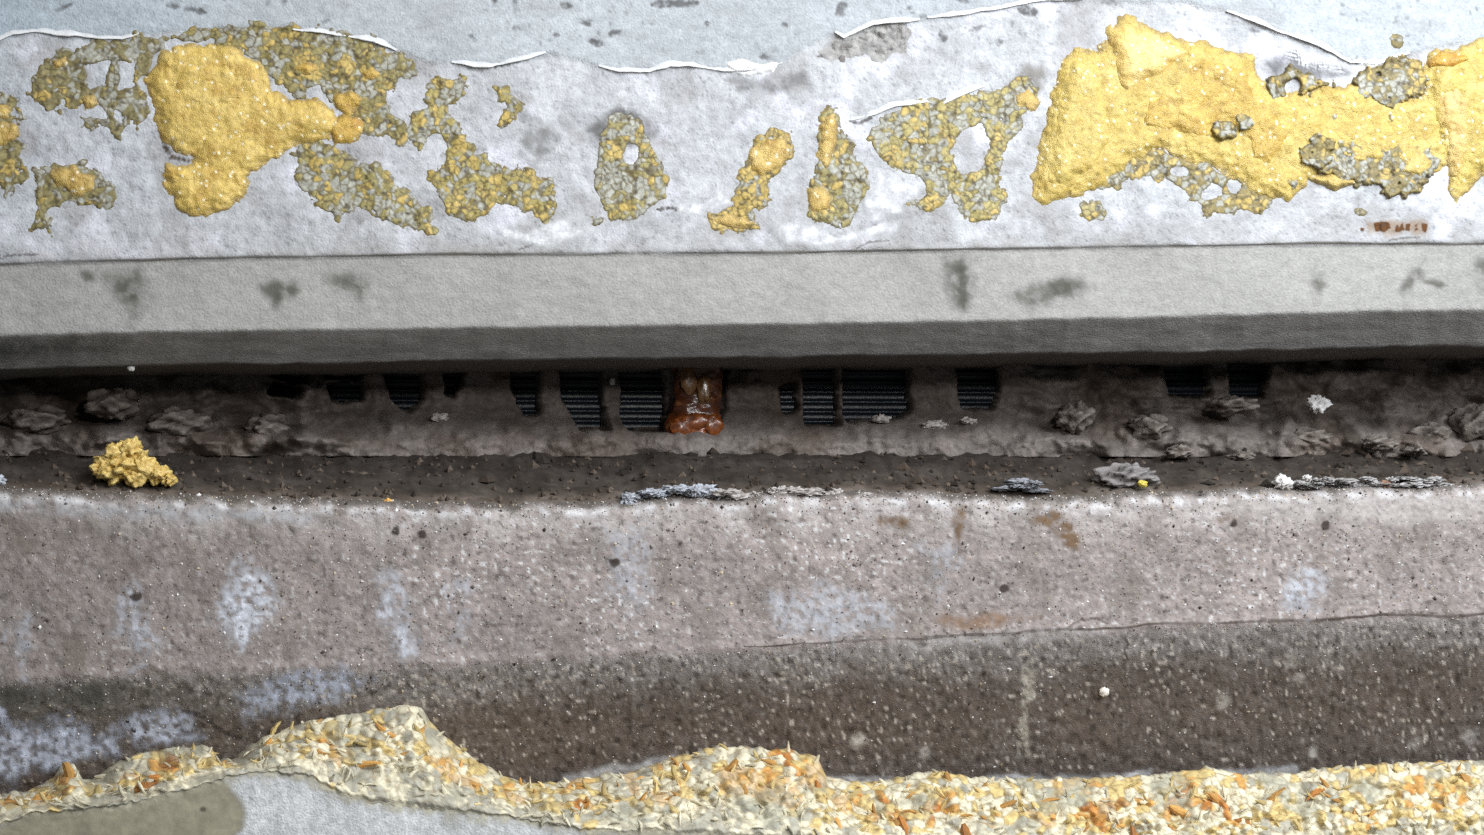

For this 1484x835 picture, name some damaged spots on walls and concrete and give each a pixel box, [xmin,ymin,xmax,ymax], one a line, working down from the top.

peeling [0,9,795,246]
peeling [779,75,1041,245]
peeling [1079,148,1273,222]
peeling [1211,113,1254,141]
peeling [1226,9,1441,200]
leakage [0,707,194,779]
spalling [0,705,1484,835]